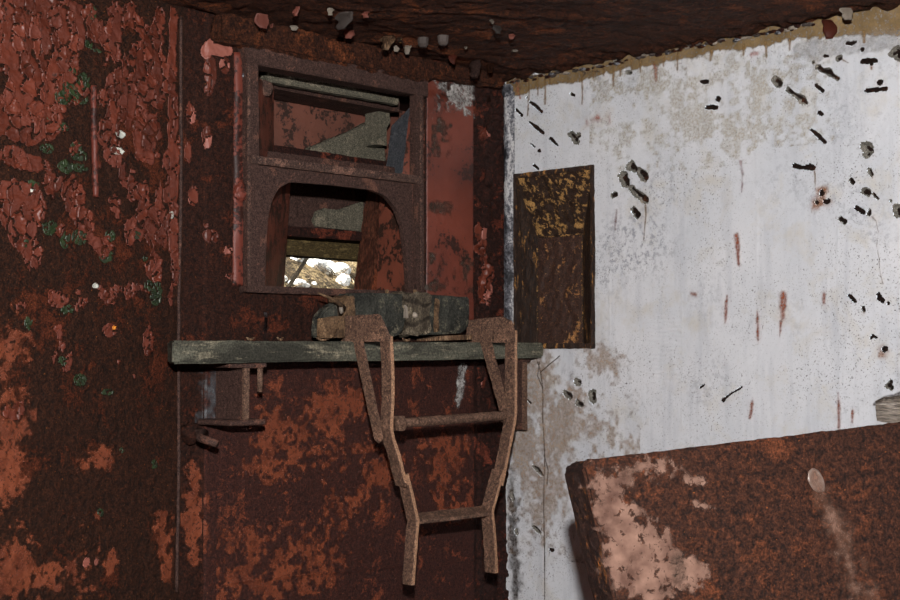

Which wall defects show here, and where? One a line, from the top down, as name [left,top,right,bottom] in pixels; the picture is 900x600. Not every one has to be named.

damp [506,5,900,116]
spalling [846,40,900,69]
spalling [864,79,888,93]
peeling [0,0,199,387]
spalling [610,159,649,230]
spalling [792,163,831,208]
spalling [849,177,900,219]
rust [0,325,37,515]
rust [0,519,120,600]
rust [152,459,210,583]
rust [216,379,405,600]
rust [400,429,472,527]